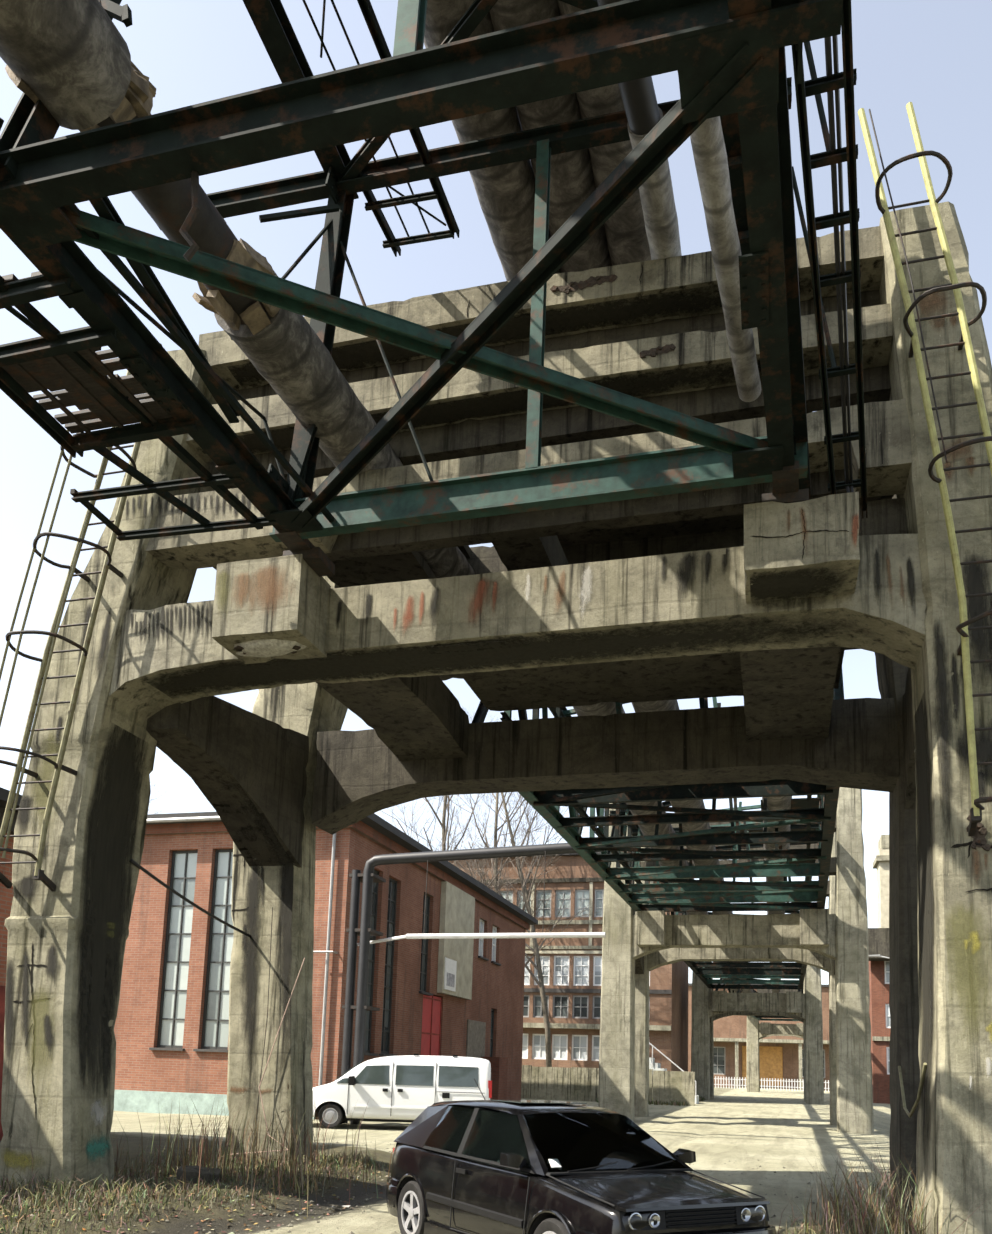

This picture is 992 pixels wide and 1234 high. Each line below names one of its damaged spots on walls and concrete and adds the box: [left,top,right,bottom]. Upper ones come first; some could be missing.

water stain [131,605,212,641]
rust [394,592,424,626]
water stain [77,725,145,1122]
water stain [238,784,294,1063]
water stain [914,555,992,1160]
crack [951,841,992,857]